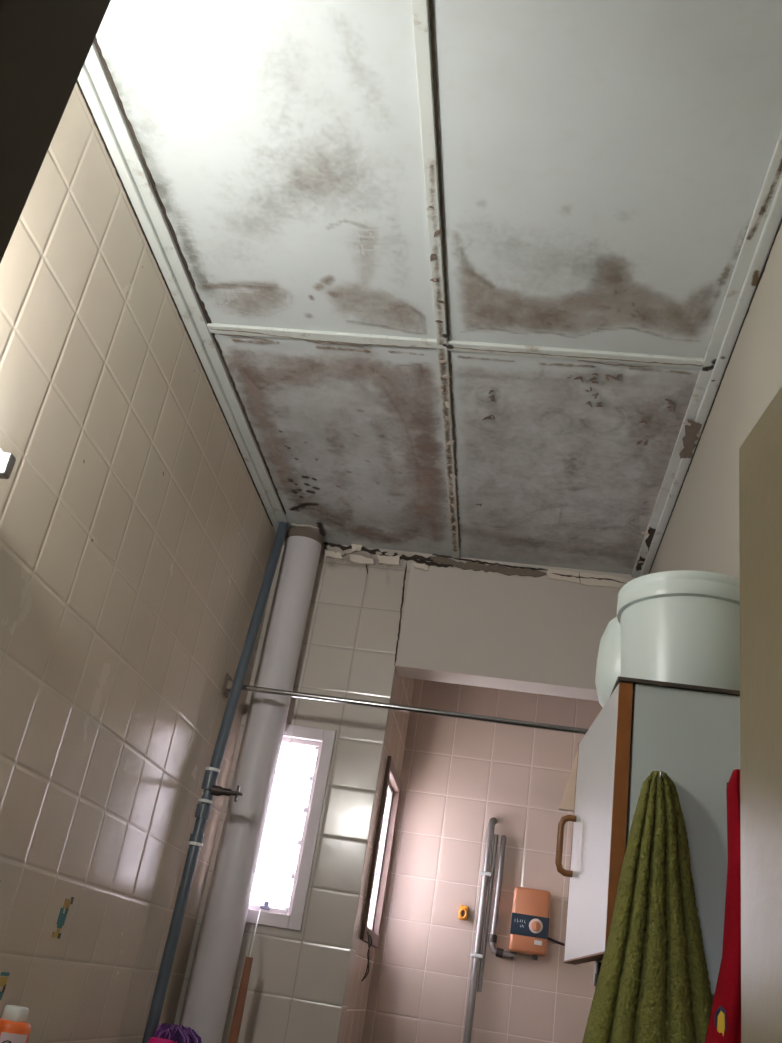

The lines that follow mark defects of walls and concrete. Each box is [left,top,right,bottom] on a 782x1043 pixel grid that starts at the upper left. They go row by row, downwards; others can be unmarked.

damp [464,263,651,329]
damp [236,362,441,541]
spalling [413,254,656,588]
spalling [679,419,702,459]
peeling [324,544,402,566]